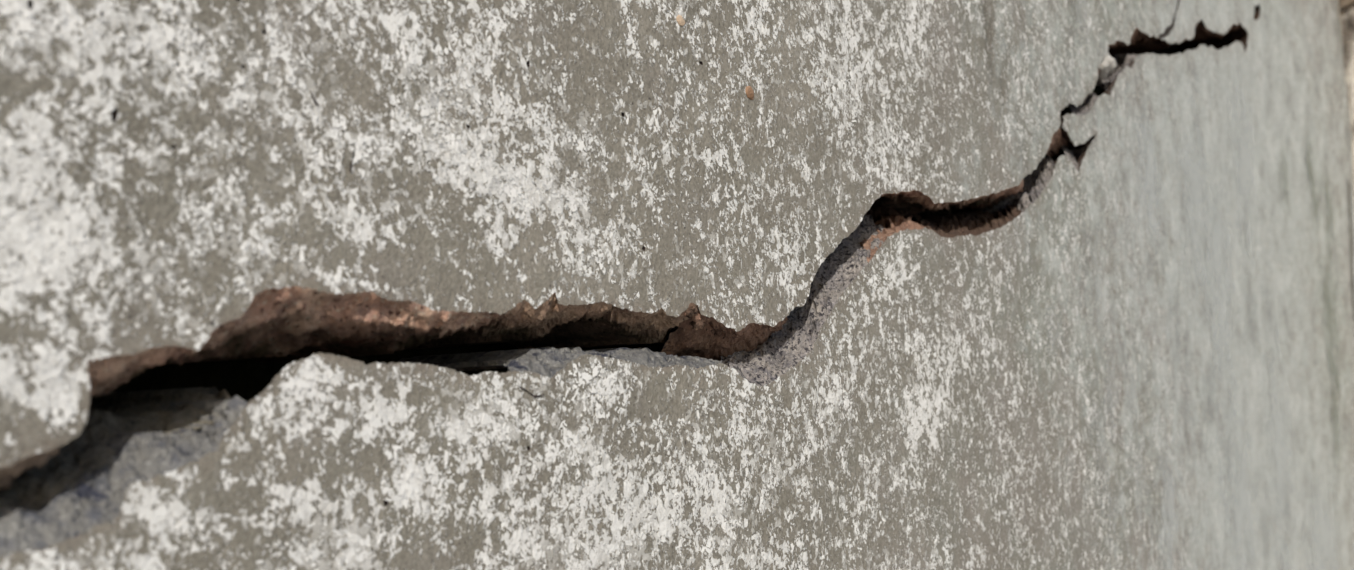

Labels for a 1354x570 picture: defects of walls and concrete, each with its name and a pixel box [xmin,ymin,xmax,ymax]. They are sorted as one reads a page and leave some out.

crack [1252,4,1260,20]
crack [396,0,1248,386]
crack [0,286,518,557]